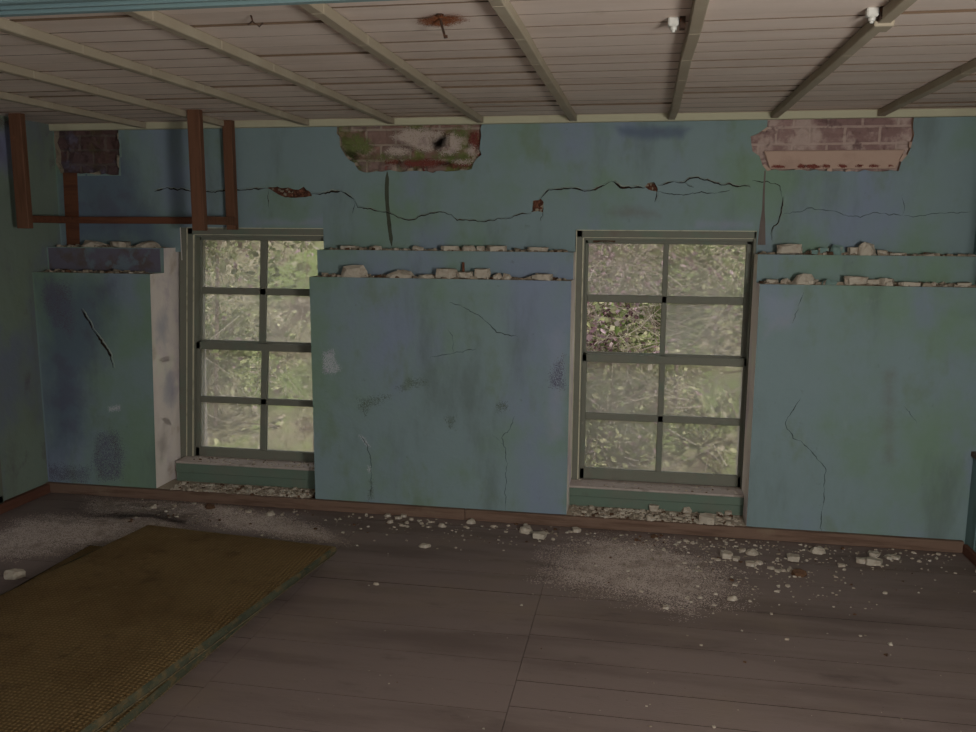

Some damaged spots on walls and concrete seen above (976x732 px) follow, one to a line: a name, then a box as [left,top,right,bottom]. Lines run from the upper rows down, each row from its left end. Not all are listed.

rust [417,14,468,27]
leakage [0,117,15,199]
spalling [54,130,120,175]
spalling [337,124,482,173]
spalling [751,118,914,172]
crack [156,186,270,207]
crack [311,172,967,246]
crack [81,309,115,367]
crack [785,398,826,529]